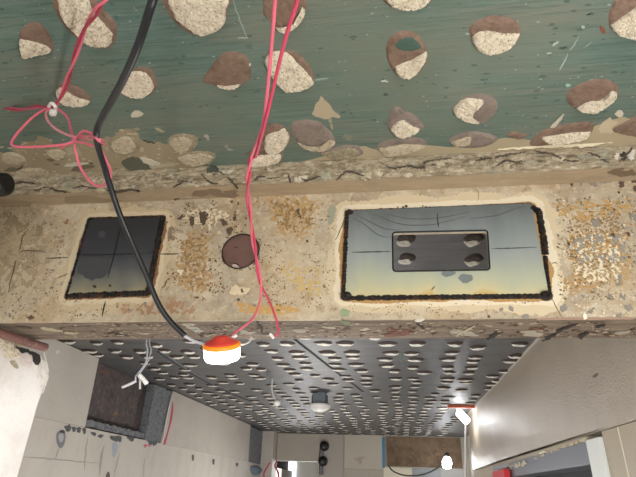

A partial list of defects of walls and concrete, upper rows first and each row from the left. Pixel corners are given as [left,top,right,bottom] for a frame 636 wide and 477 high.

spalling [122,156,161,171]
crack [380,158,451,170]
crack [475,147,633,169]
peeling [614,149,635,161]
crack [15,165,141,194]
crack [173,168,238,198]
spalling [207,166,234,176]
crack [254,174,321,183]
crack [337,171,370,180]
peeling [360,171,413,181]
corrosion [552,194,636,301]